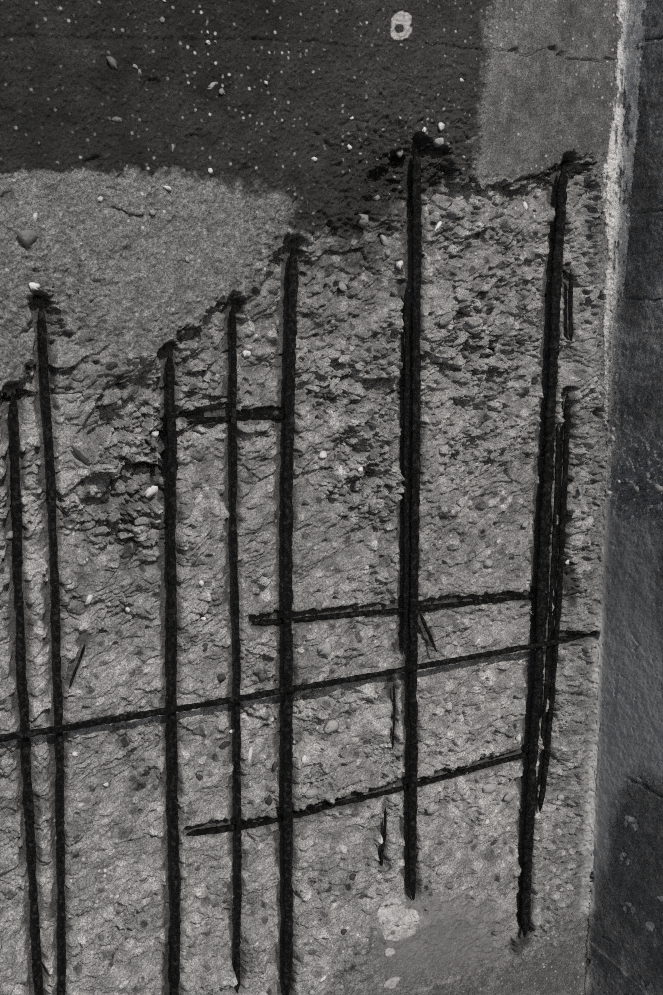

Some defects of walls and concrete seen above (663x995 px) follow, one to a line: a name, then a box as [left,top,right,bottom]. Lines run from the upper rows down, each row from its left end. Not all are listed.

spalling [0,140,610,995]